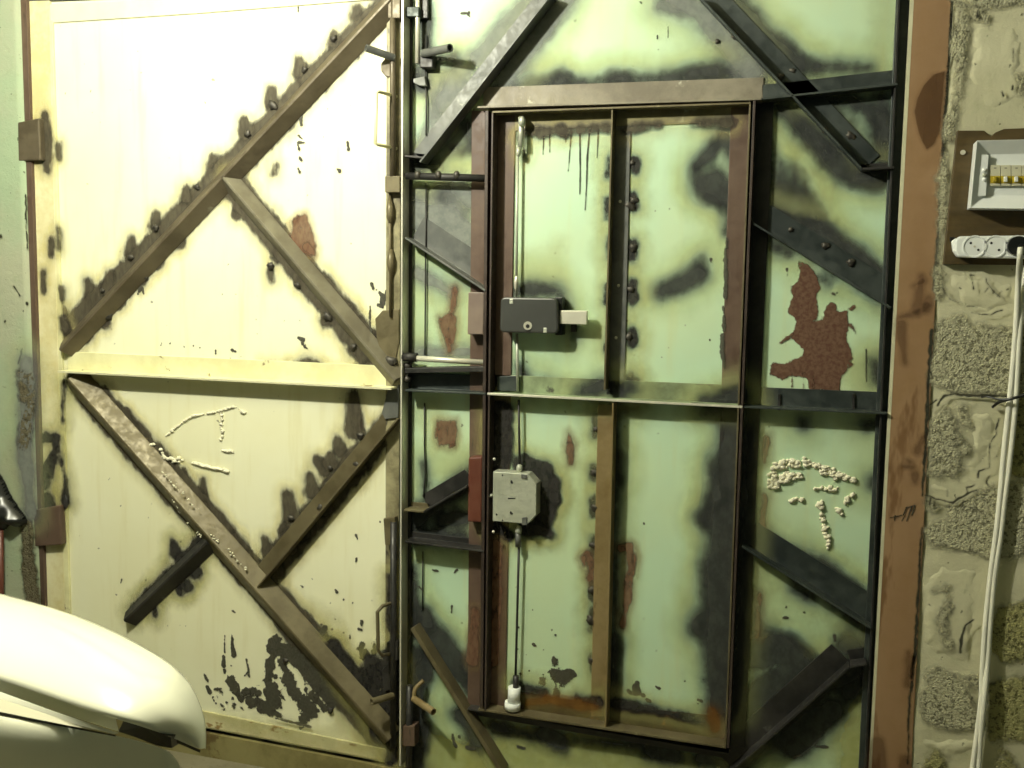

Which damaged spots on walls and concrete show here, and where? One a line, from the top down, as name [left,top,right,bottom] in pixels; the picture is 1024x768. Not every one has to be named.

rust [290,213,317,256]
rust [438,286,458,353]
rust [770,262,856,390]
rust [435,420,458,448]
peeling [204,633,338,730]